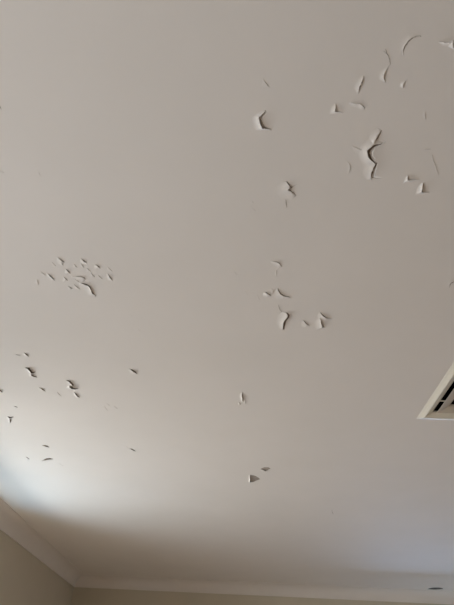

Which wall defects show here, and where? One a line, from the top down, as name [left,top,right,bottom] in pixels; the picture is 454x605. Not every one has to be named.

peeling [251,110,276,131]
peeling [352,128,395,180]
peeling [34,257,113,297]
peeling [263,288,291,330]
peeling [248,467,270,483]